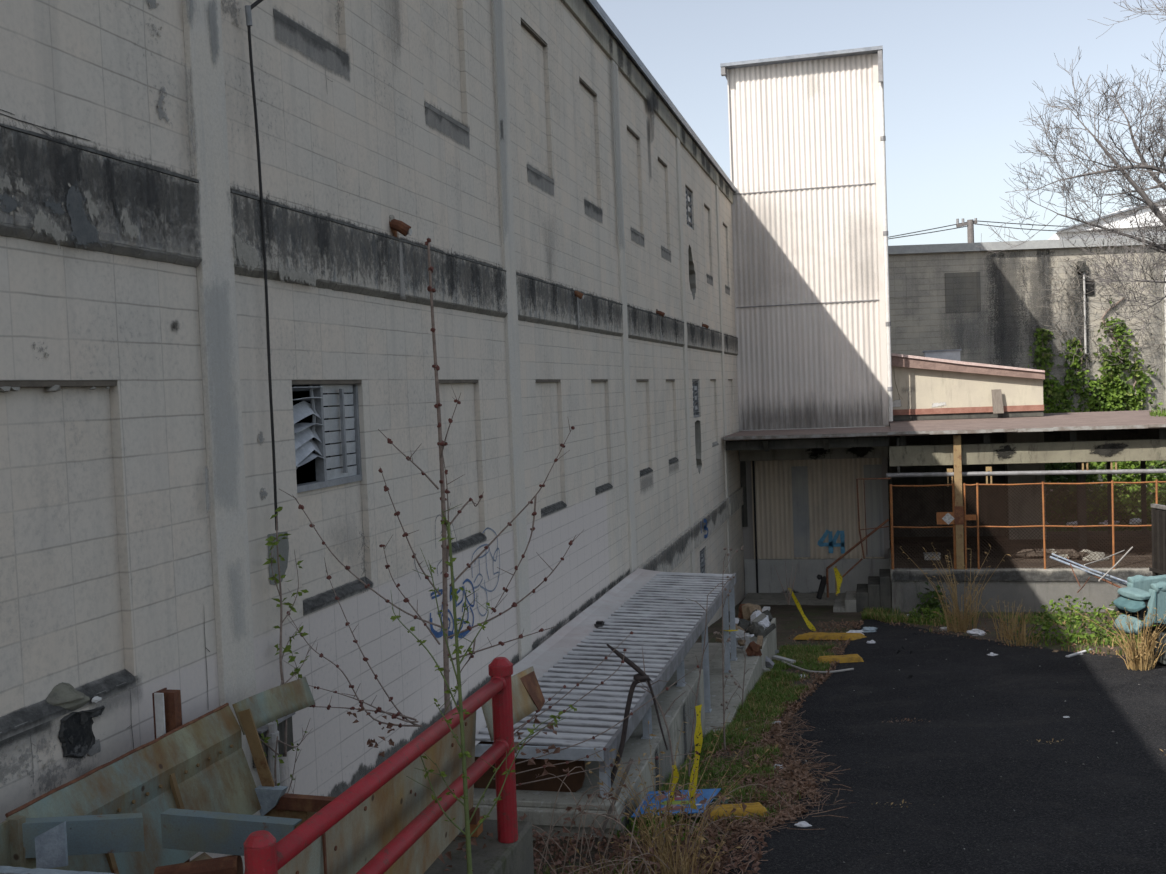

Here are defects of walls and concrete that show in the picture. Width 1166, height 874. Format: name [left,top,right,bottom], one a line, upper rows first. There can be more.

peeling [0,174,68,246]
peeling [82,188,99,221]
water stain [0,126,200,249]
peeling [120,208,139,239]
water stain [230,186,738,353]
water stain [988,249,1092,396]
spalling [1090,443,1128,457]
spalling [0,696,105,796]